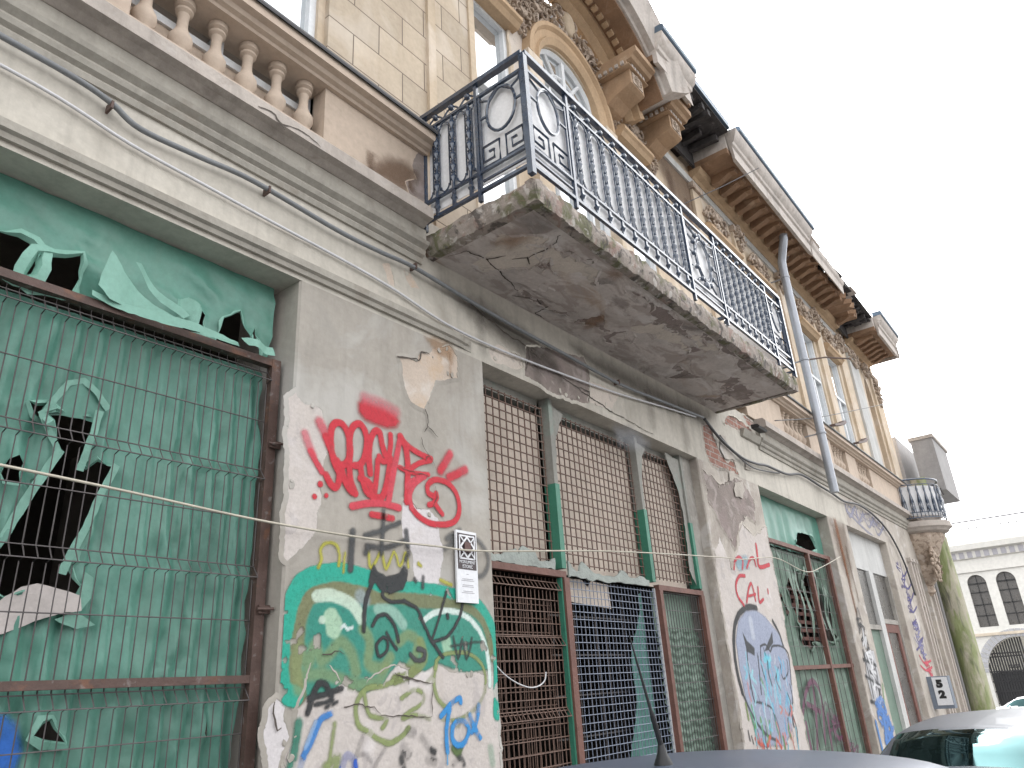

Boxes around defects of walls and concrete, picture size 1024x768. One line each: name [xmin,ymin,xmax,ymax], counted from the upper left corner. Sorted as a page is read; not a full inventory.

flaking render [507,30,522,72]
crack [451,235,560,318]
damp [461,298,557,370]
peeling [396,342,460,413]
peeling [278,387,330,567]
spalling [425,162,810,750]
spalling [257,661,503,768]